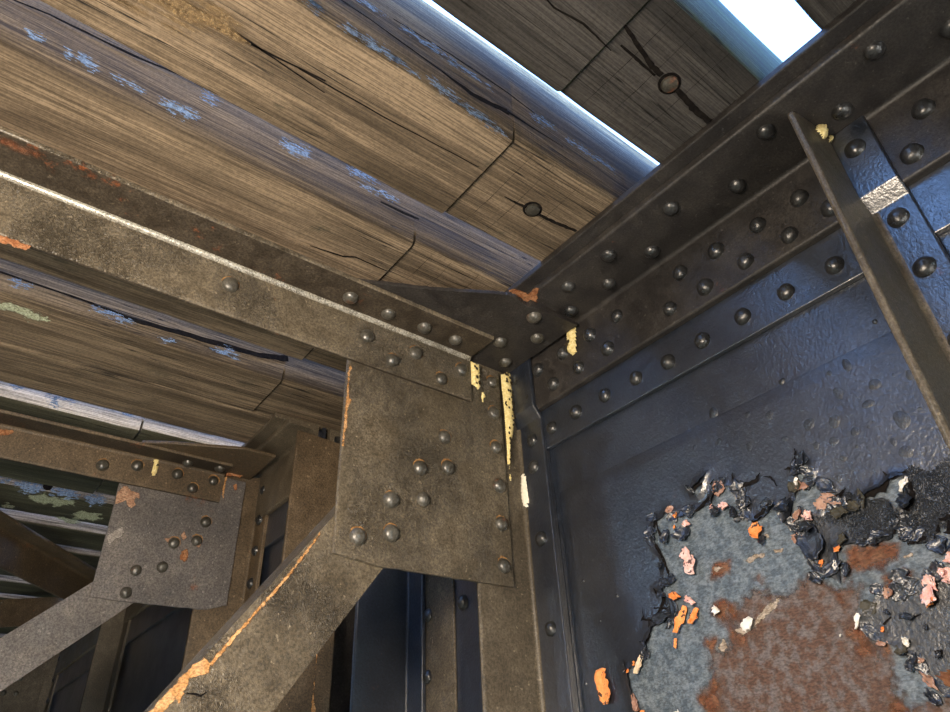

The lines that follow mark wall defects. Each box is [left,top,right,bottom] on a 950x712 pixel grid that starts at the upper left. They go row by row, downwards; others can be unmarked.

corrosion [0,236,31,250]
corrosion [508,288,539,302]
corrosion [115,486,139,508]
peeling [559,331,950,712]
corrosion [107,527,125,545]
corrosion [149,532,320,712]